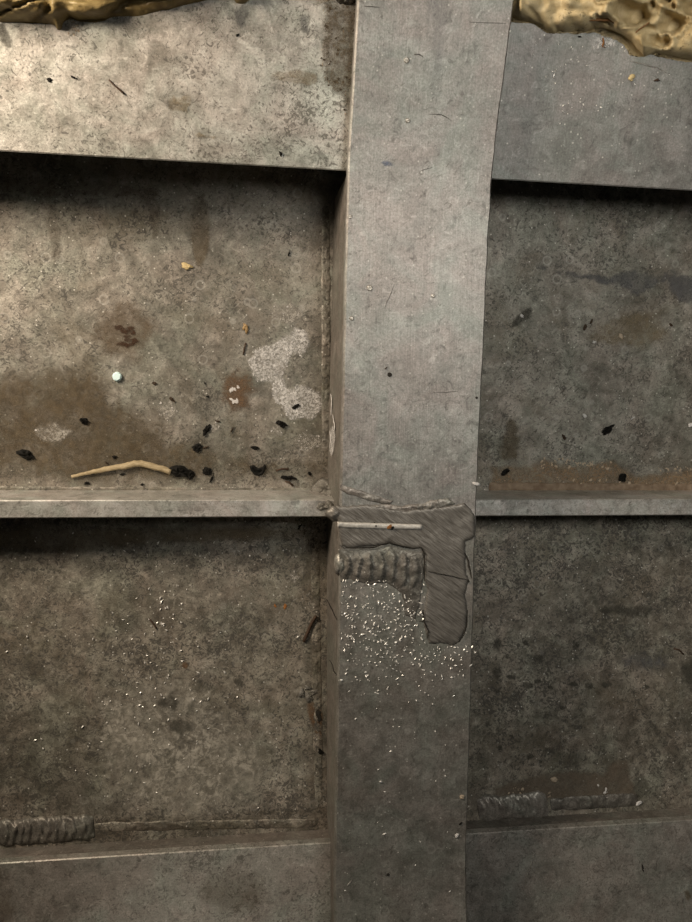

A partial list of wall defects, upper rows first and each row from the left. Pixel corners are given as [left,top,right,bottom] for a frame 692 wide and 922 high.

water stain [0,376,215,478]
rust [103,320,150,349]
rust [223,305,335,455]